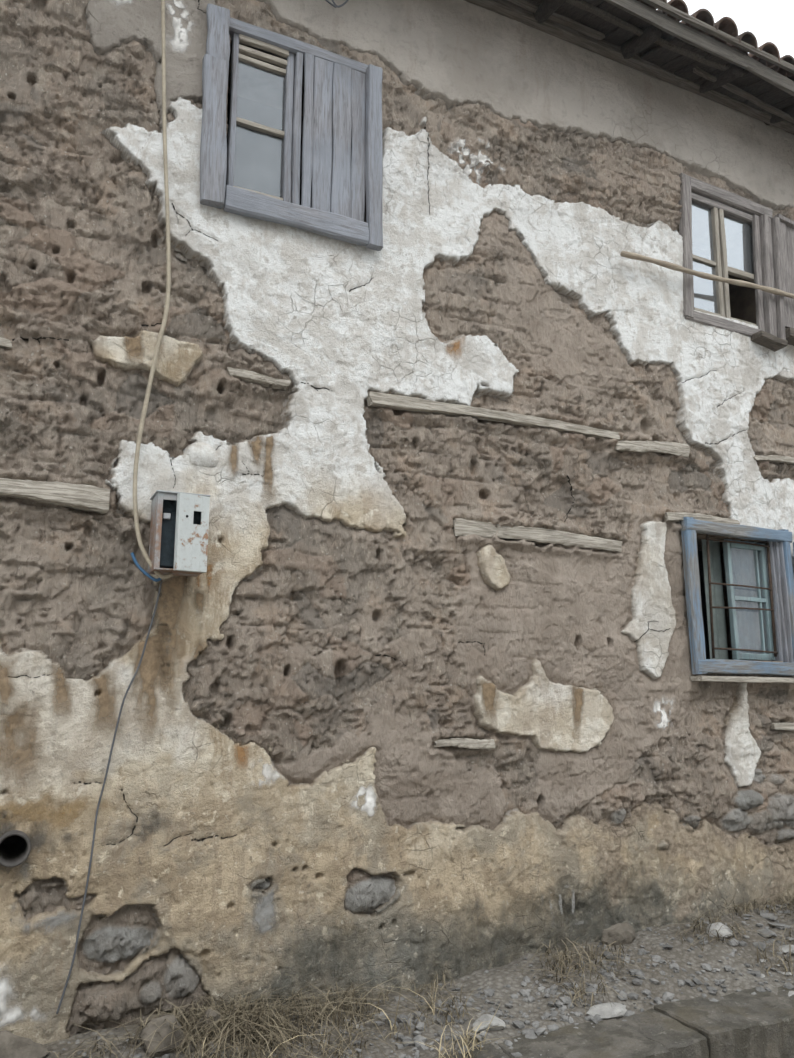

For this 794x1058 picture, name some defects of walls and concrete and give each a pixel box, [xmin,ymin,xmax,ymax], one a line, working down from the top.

flaking render [215,0,794,233]
flaking render [0,0,293,680]
flaking render [182,211,794,847]
leakage [0,663,35,770]
leakage [54,667,70,707]
leakage [93,673,116,723]
leakage [134,576,204,727]